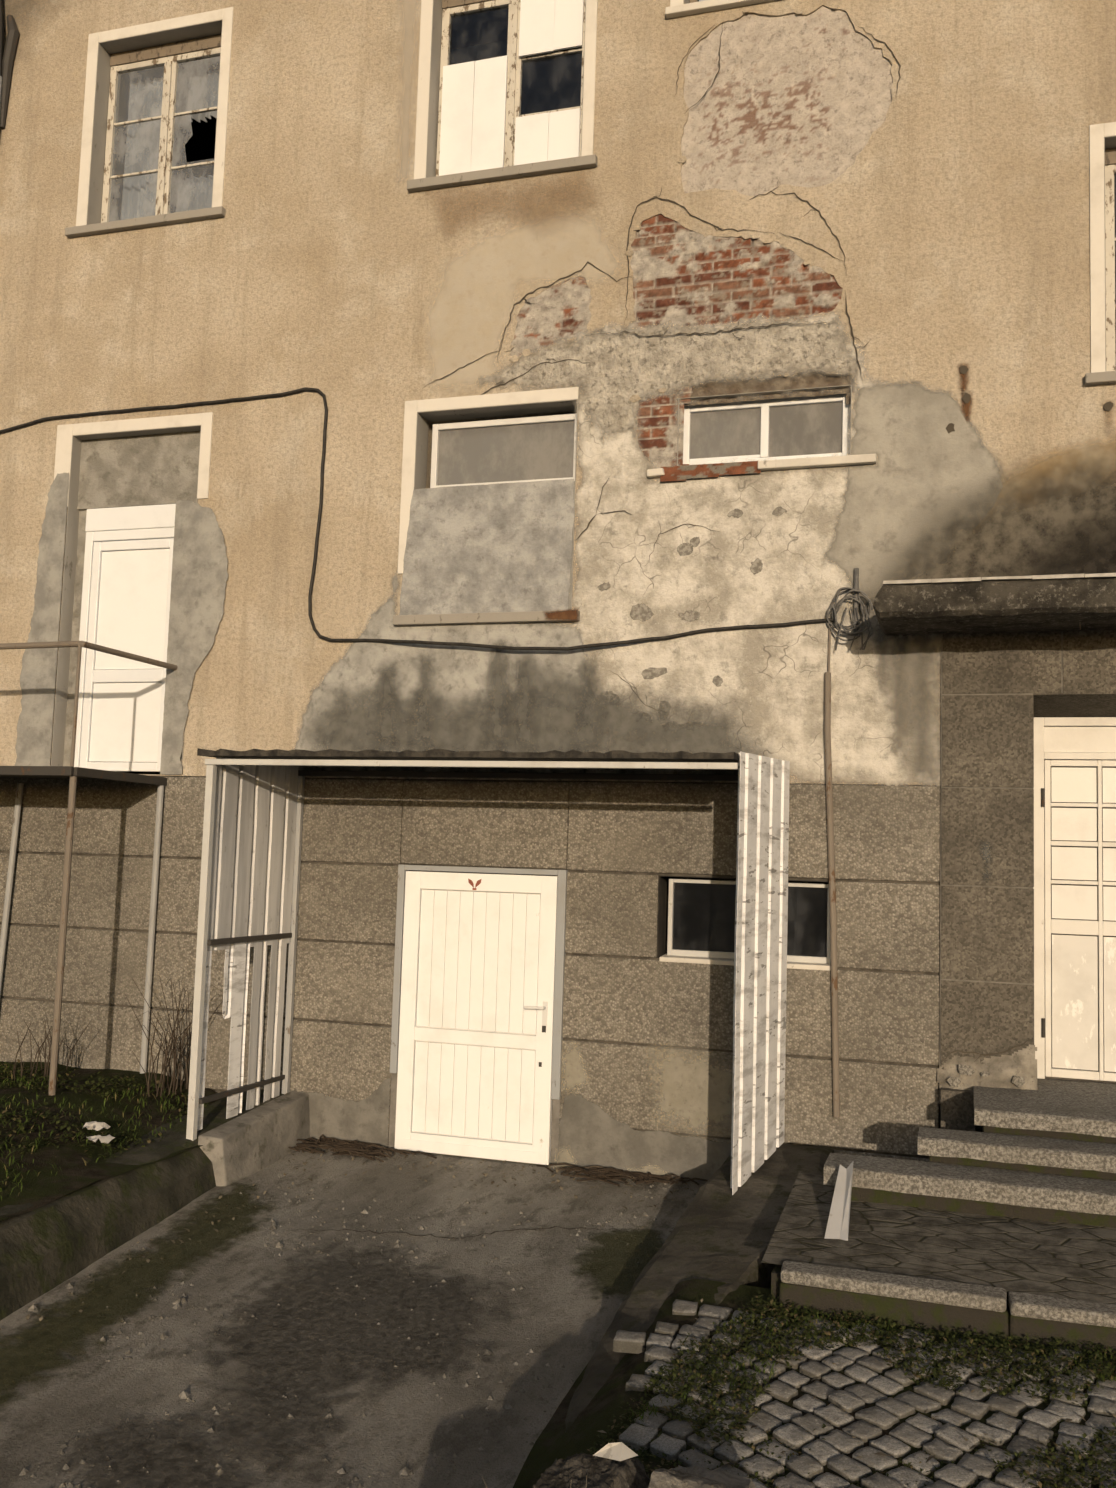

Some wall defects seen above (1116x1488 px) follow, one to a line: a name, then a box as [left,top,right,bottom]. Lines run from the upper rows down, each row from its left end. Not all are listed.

flaking render [678,4,893,197]
crack [426,181,868,395]
rust [946,365,972,433]
peeling [431,215,941,786]
leakage [893,441,1116,586]
leakage [315,645,762,774]